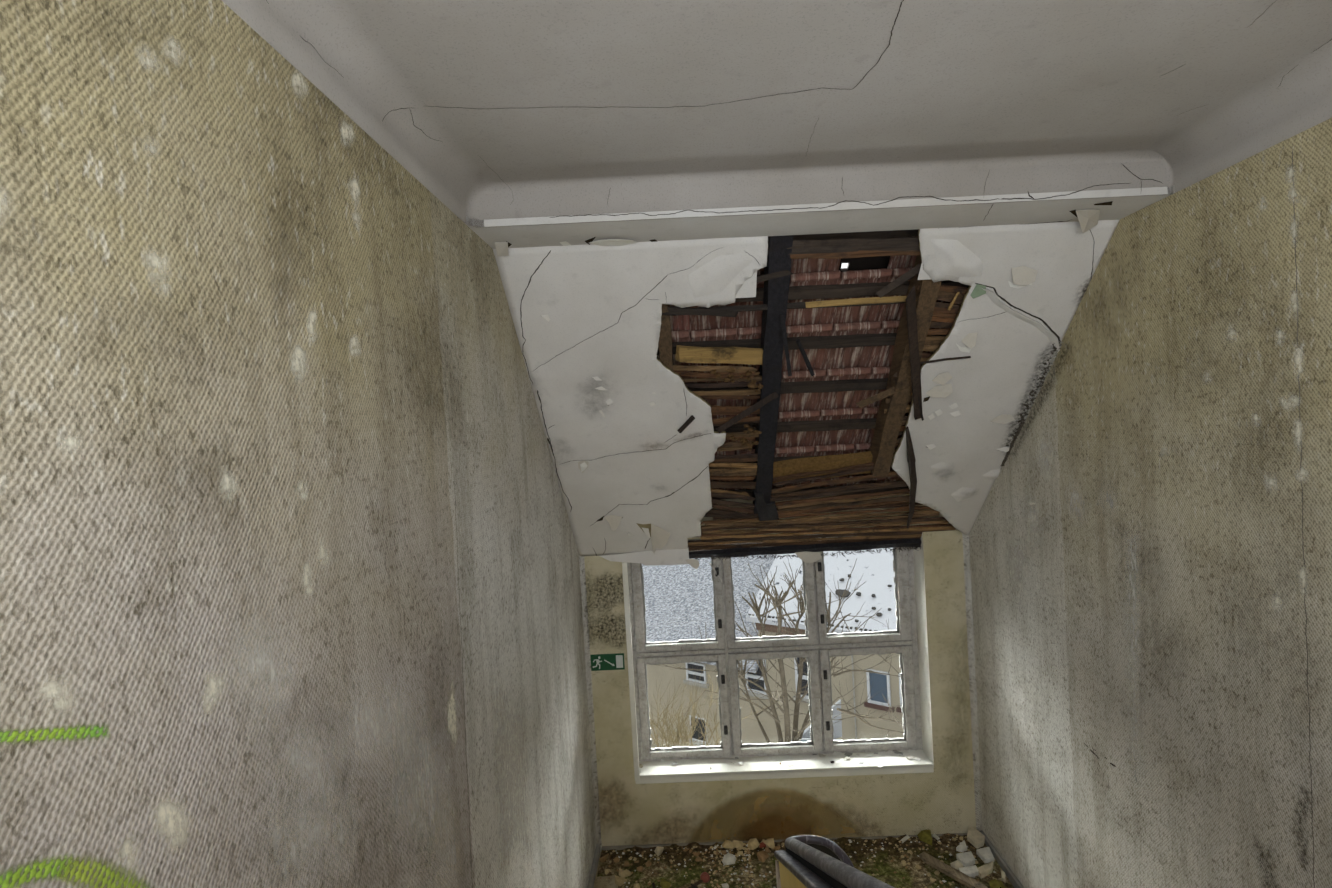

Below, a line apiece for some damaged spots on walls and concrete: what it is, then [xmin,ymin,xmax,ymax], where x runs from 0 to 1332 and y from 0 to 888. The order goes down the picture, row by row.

crack [383,106,504,142]
crack [636,0,904,152]
crack [549,163,1162,279]
crack [957,283,1061,344]
crack [520,247,760,556]